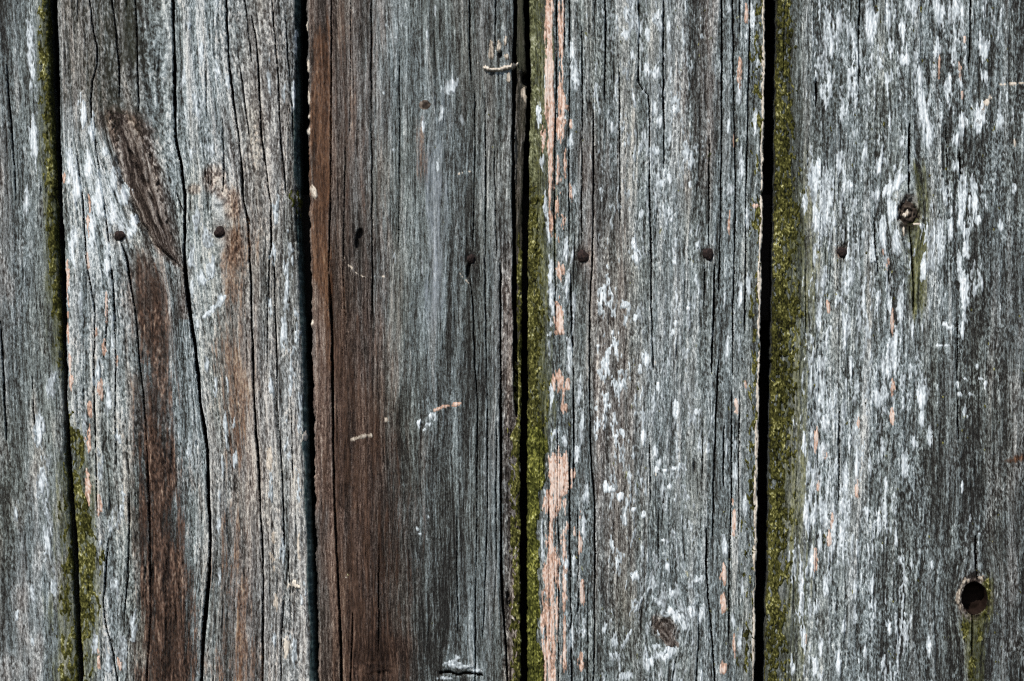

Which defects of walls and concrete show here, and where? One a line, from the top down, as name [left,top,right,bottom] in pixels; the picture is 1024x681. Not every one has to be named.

crack [171,0,212,681]
damp [528,0,556,435]
crack [548,0,665,681]
peeling [536,0,766,681]
damp [784,207,815,593]